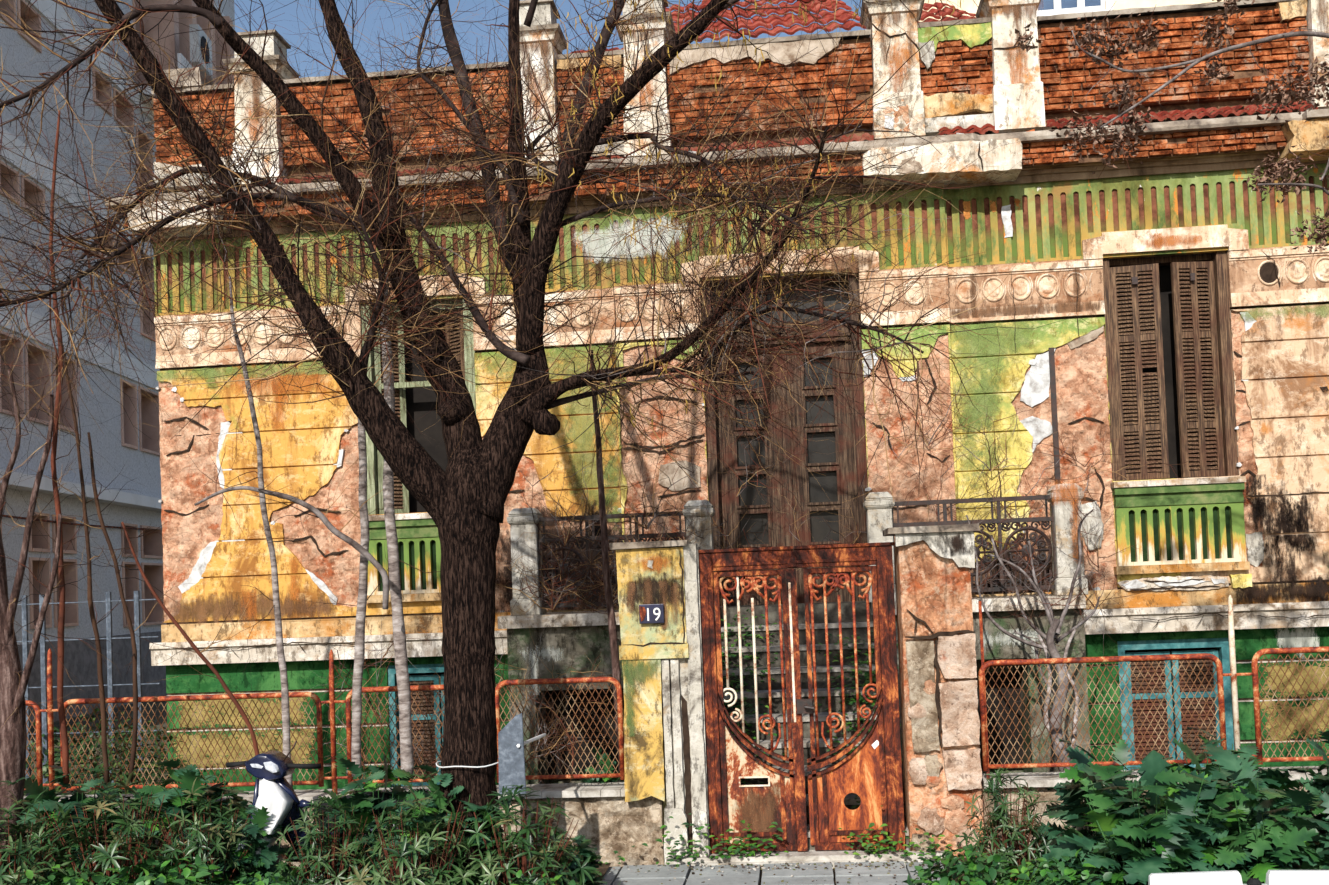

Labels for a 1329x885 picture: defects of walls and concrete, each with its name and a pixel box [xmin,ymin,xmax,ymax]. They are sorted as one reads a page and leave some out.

peeling [575,216,687,262]
spalling [156,381,245,622]
spalling [270,424,369,607]
spalling [862,334,957,539]
spalling [970,325,1229,595]
water stain [1236,475,1329,604]
corrosion [738,783,780,832]